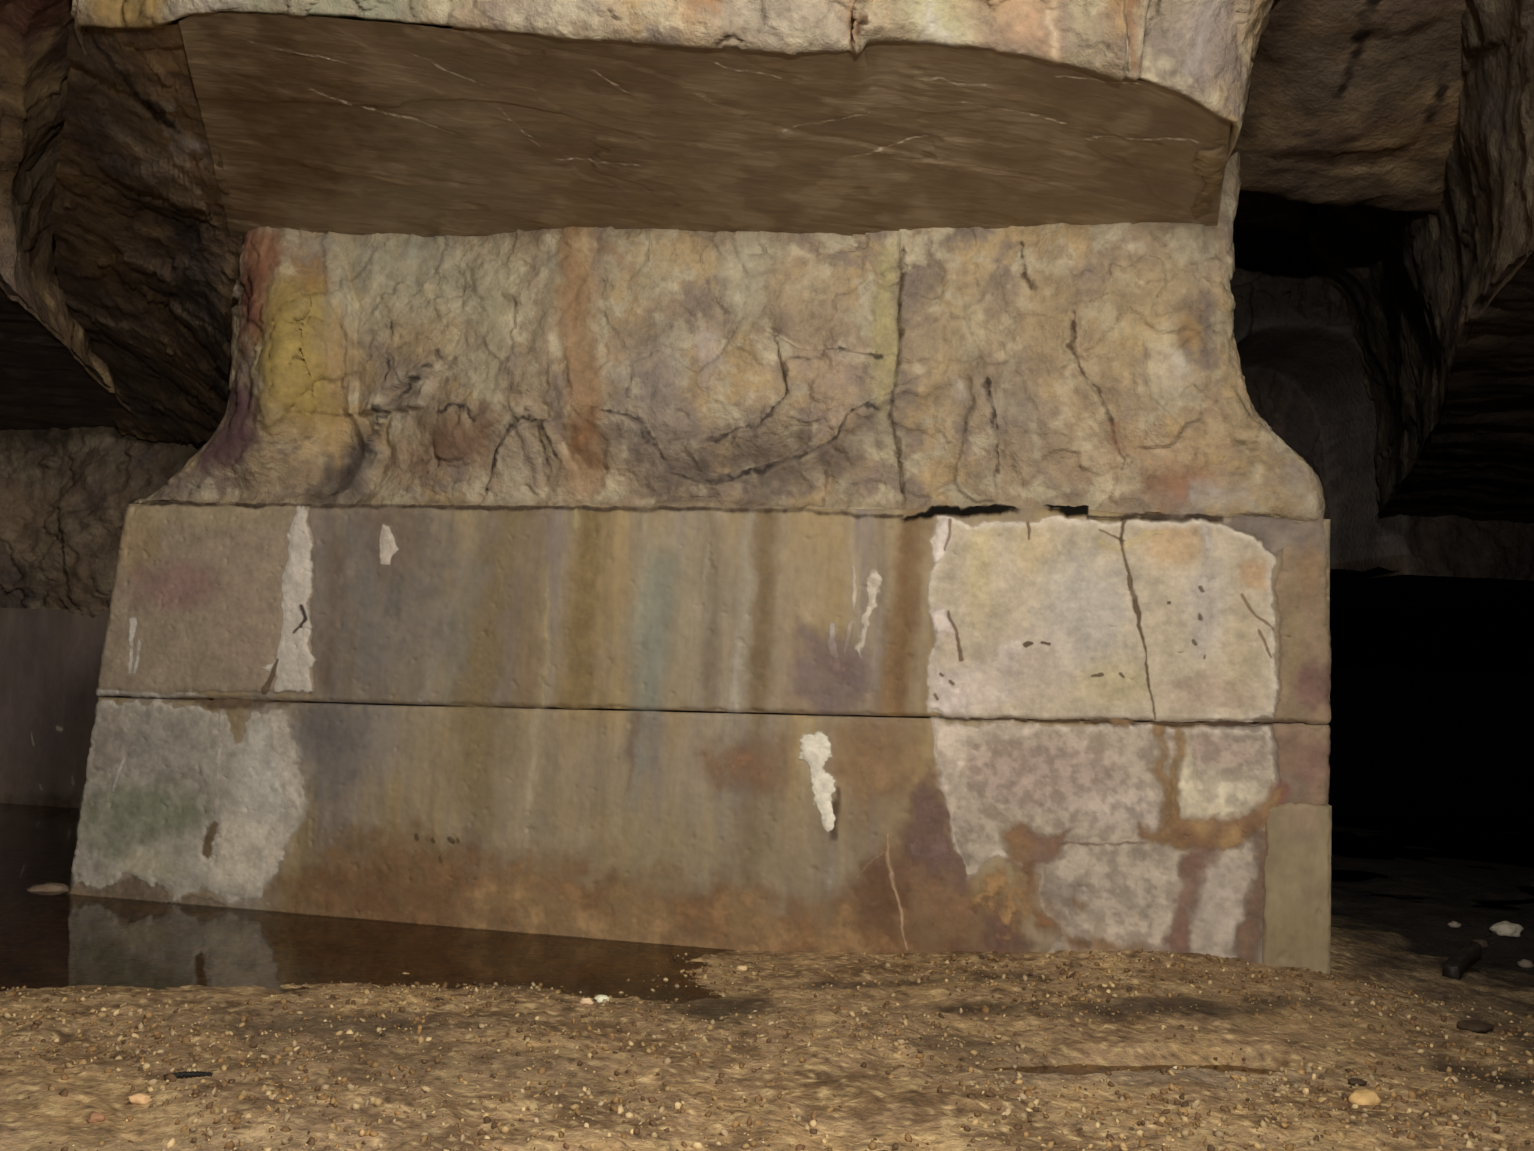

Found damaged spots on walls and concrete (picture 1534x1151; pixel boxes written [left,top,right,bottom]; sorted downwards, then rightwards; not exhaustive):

crack [850,15,868,41]
crack [147,242,1274,726]
flaking render [69,503,315,911]
damp [282,773,918,953]
damp [722,511,774,757]
flaking render [799,732,840,837]
damp [879,518,919,716]
rust [1139,724,1286,963]